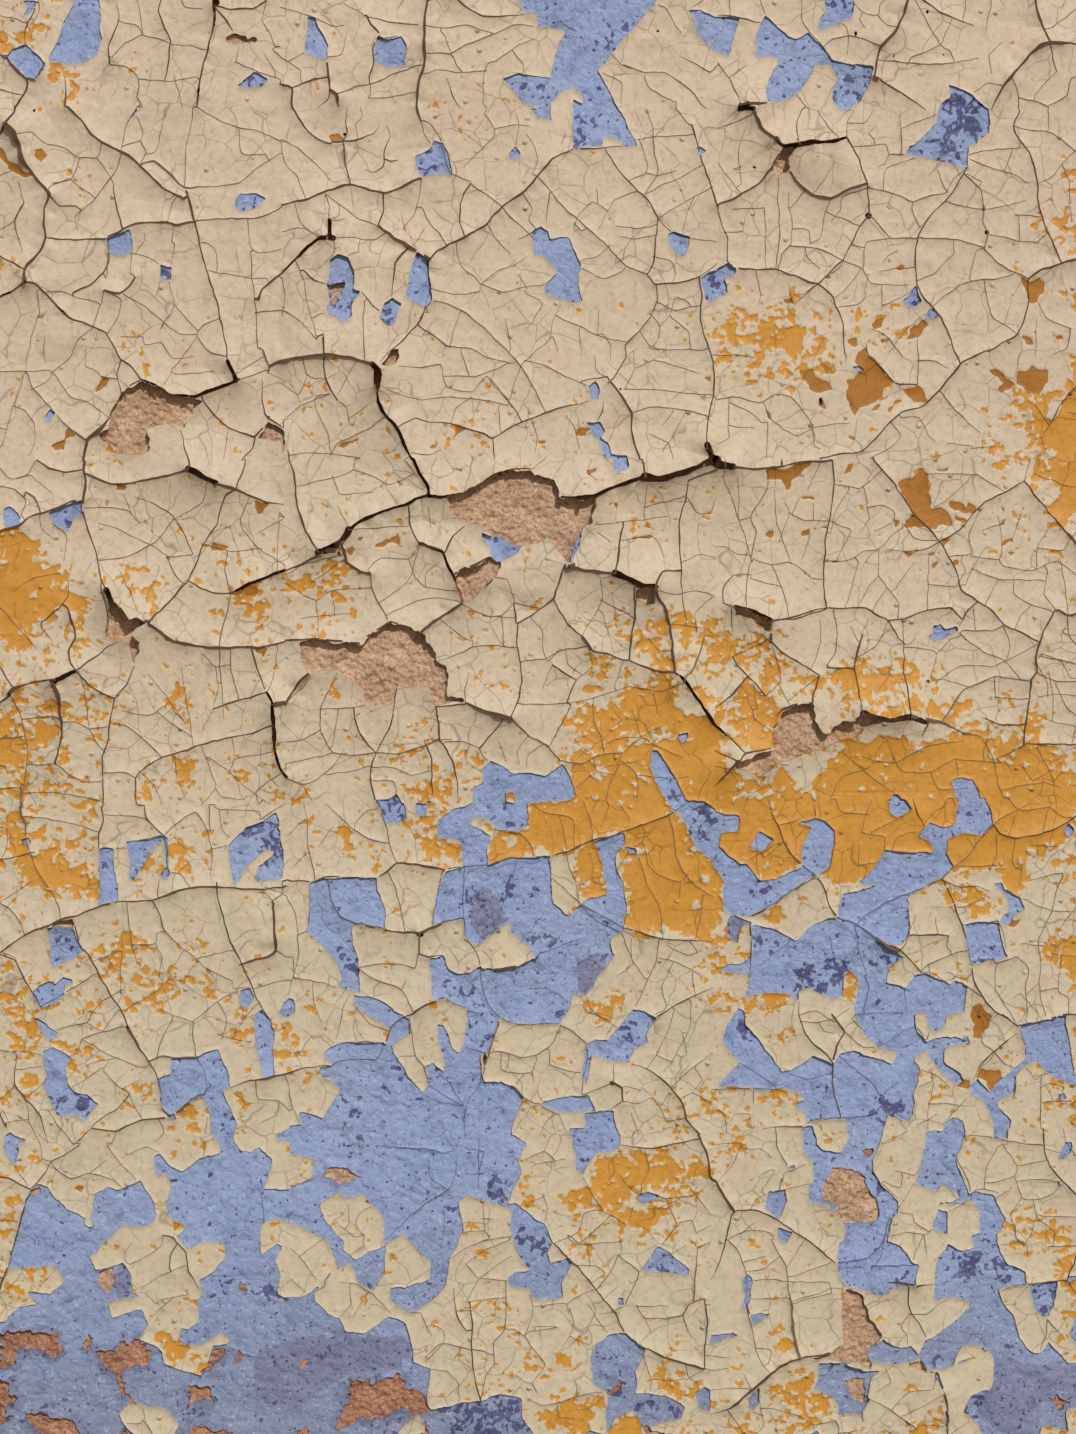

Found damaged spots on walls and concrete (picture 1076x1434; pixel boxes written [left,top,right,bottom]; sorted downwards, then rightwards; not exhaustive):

peeling [502,0,655,156]
crack [801,0,976,110]
spalling [32,322,202,467]
peeling [317,236,360,322]
peeling [532,227,597,314]
spalling [668,214,938,443]
crack [716,621,821,730]
peeling [0,342,1076,1434]
crack [949,1071,1076,1294]
crack [410,1177,726,1401]
crack [887,1282,947,1345]
crack [870,1357,974,1434]